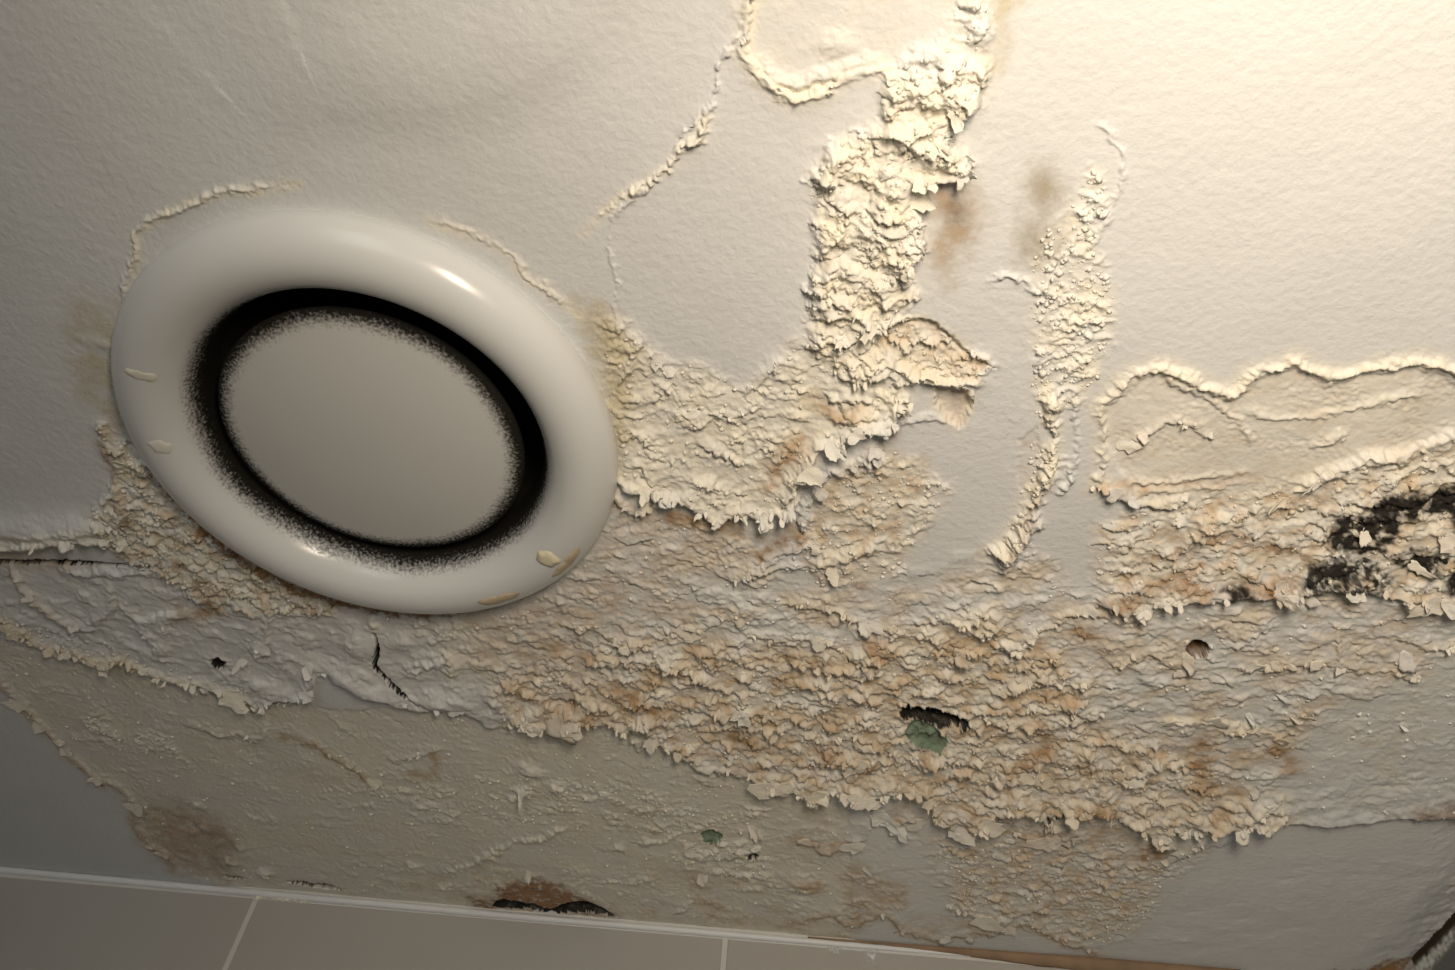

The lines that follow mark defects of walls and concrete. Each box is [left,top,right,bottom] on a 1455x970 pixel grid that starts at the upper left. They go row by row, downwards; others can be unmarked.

crack [576,17,755,348]
crack [0,559,150,571]
spalling [89,424,360,619]
peeling [434,110,1455,853]
water stain [1223,586,1251,603]
water stain [1304,486,1455,598]
crack [373,633,419,709]
peeling [0,632,1240,970]
spalling [1410,930,1454,970]